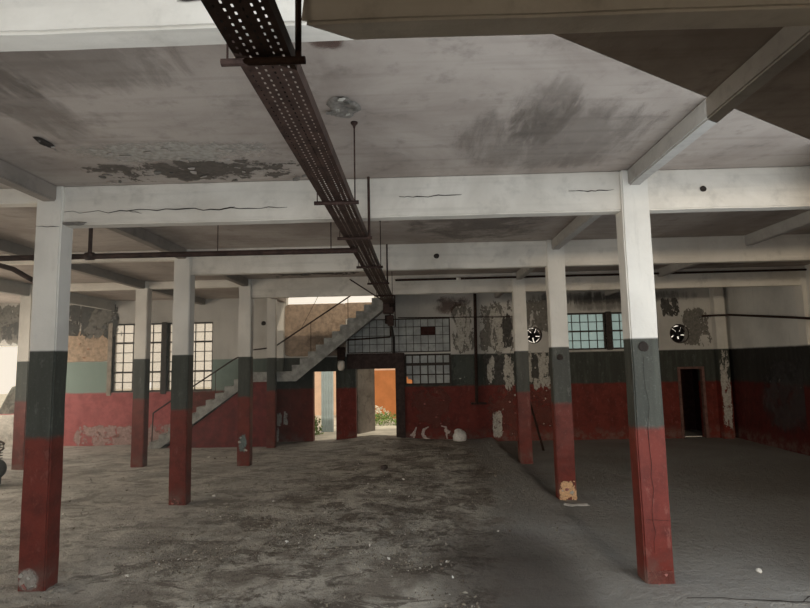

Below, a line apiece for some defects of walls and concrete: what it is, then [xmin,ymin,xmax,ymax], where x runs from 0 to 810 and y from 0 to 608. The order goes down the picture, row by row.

crack [37,206,285,227]
peeling [0,304,20,345]
peeling [67,304,122,362]
peeling [526,299,548,332]
peeling [660,298,712,347]
peeling [451,300,516,438]
peeling [528,351,563,401]
peeling [720,350,733,428]
spalling [559,481,577,500]
spalling [18,570,37,590]